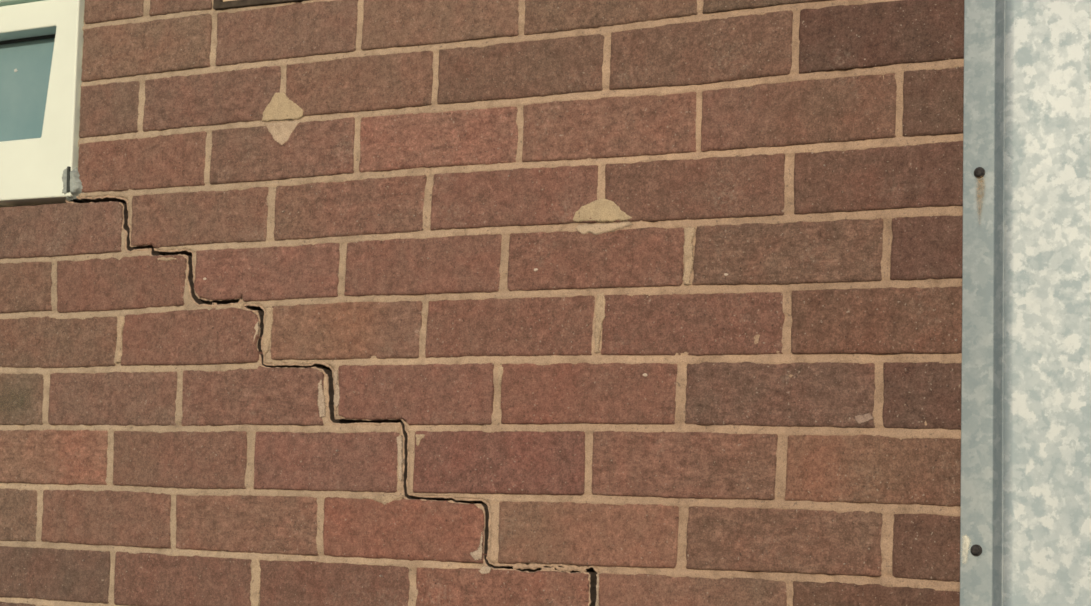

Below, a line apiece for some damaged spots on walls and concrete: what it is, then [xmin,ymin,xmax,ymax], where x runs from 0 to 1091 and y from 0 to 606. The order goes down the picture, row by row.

crack [66,195,599,606]